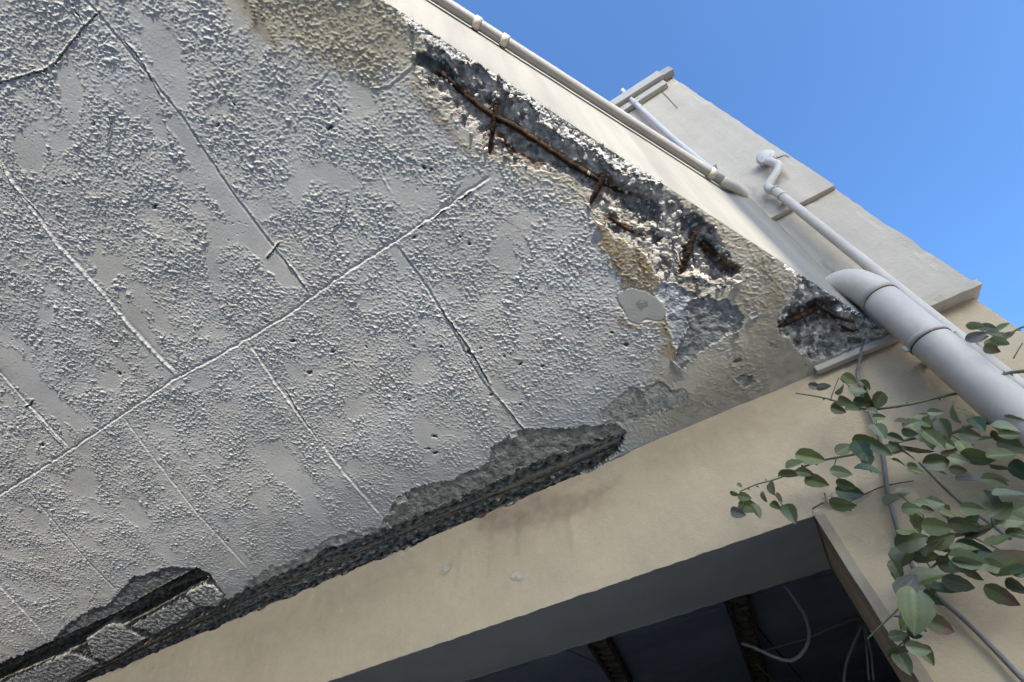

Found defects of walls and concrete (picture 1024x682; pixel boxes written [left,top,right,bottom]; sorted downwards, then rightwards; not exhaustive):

crack [0,1,100,87]
crack [123,40,160,94]
crack [0,163,40,214]
spalling [396,9,759,371]
crack [266,243,306,288]
corrosion [602,230,660,286]
spalling [775,264,888,362]
crack [441,309,523,429]
crack [24,401,66,451]
crack [284,390,321,444]
peeling [243,379,690,590]
spalling [0,566,234,682]